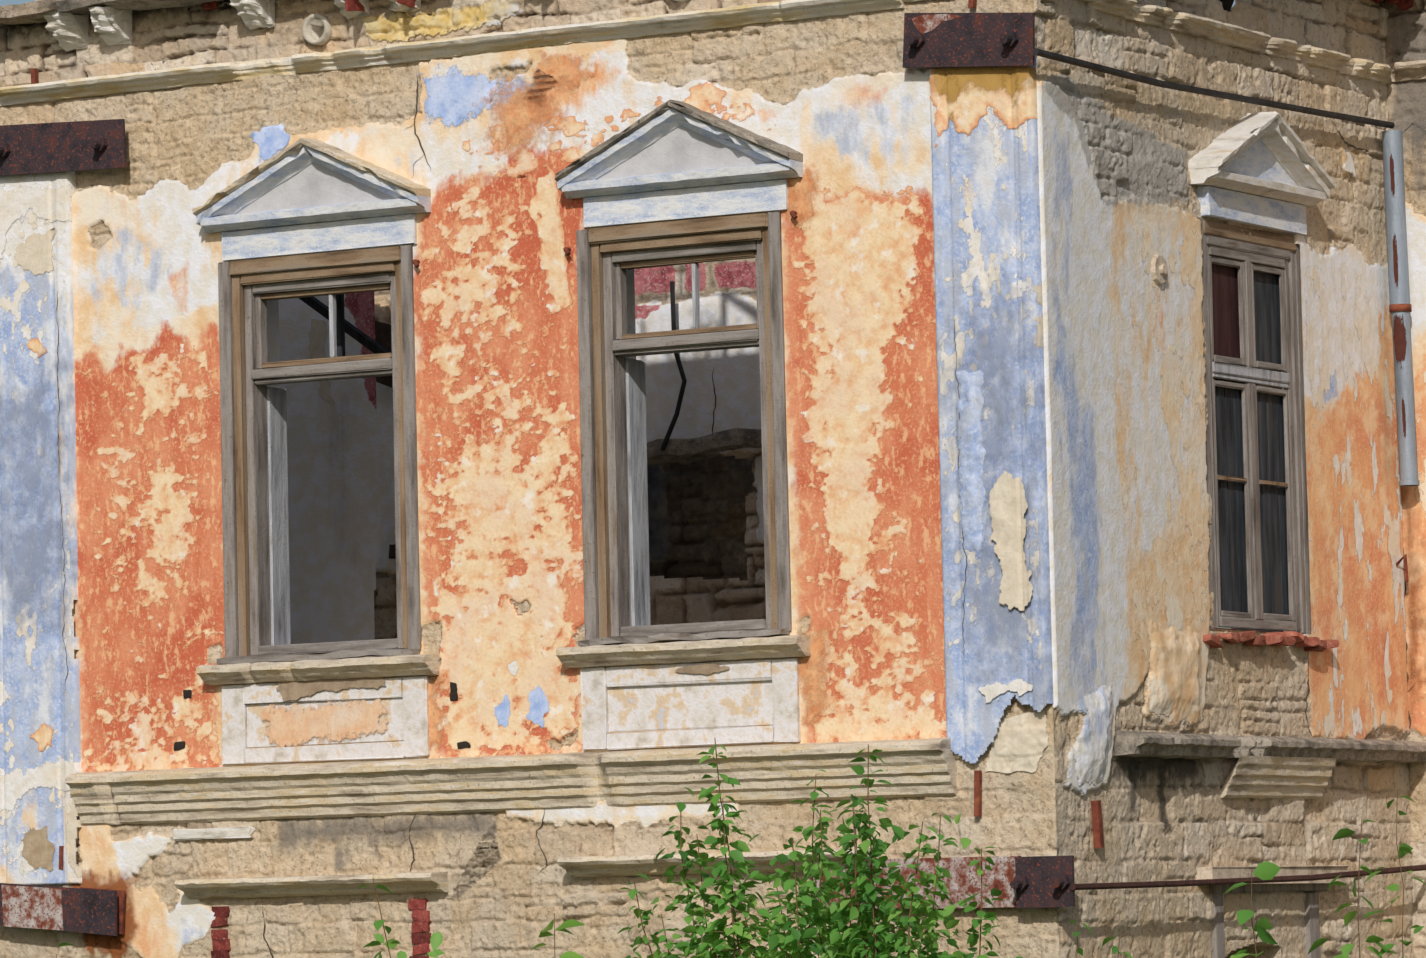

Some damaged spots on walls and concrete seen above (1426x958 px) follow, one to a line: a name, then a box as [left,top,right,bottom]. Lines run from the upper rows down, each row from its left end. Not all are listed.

flaking render [1393,91,1426,217]
peeling [0,209,65,365]
peeling [73,0,1044,758]
flaking render [1177,127,1426,742]
peeling [0,339,225,885]
flaking render [163,775,972,958]
flaking render [985,708,1049,774]
flaking render [1408,762,1426,843]